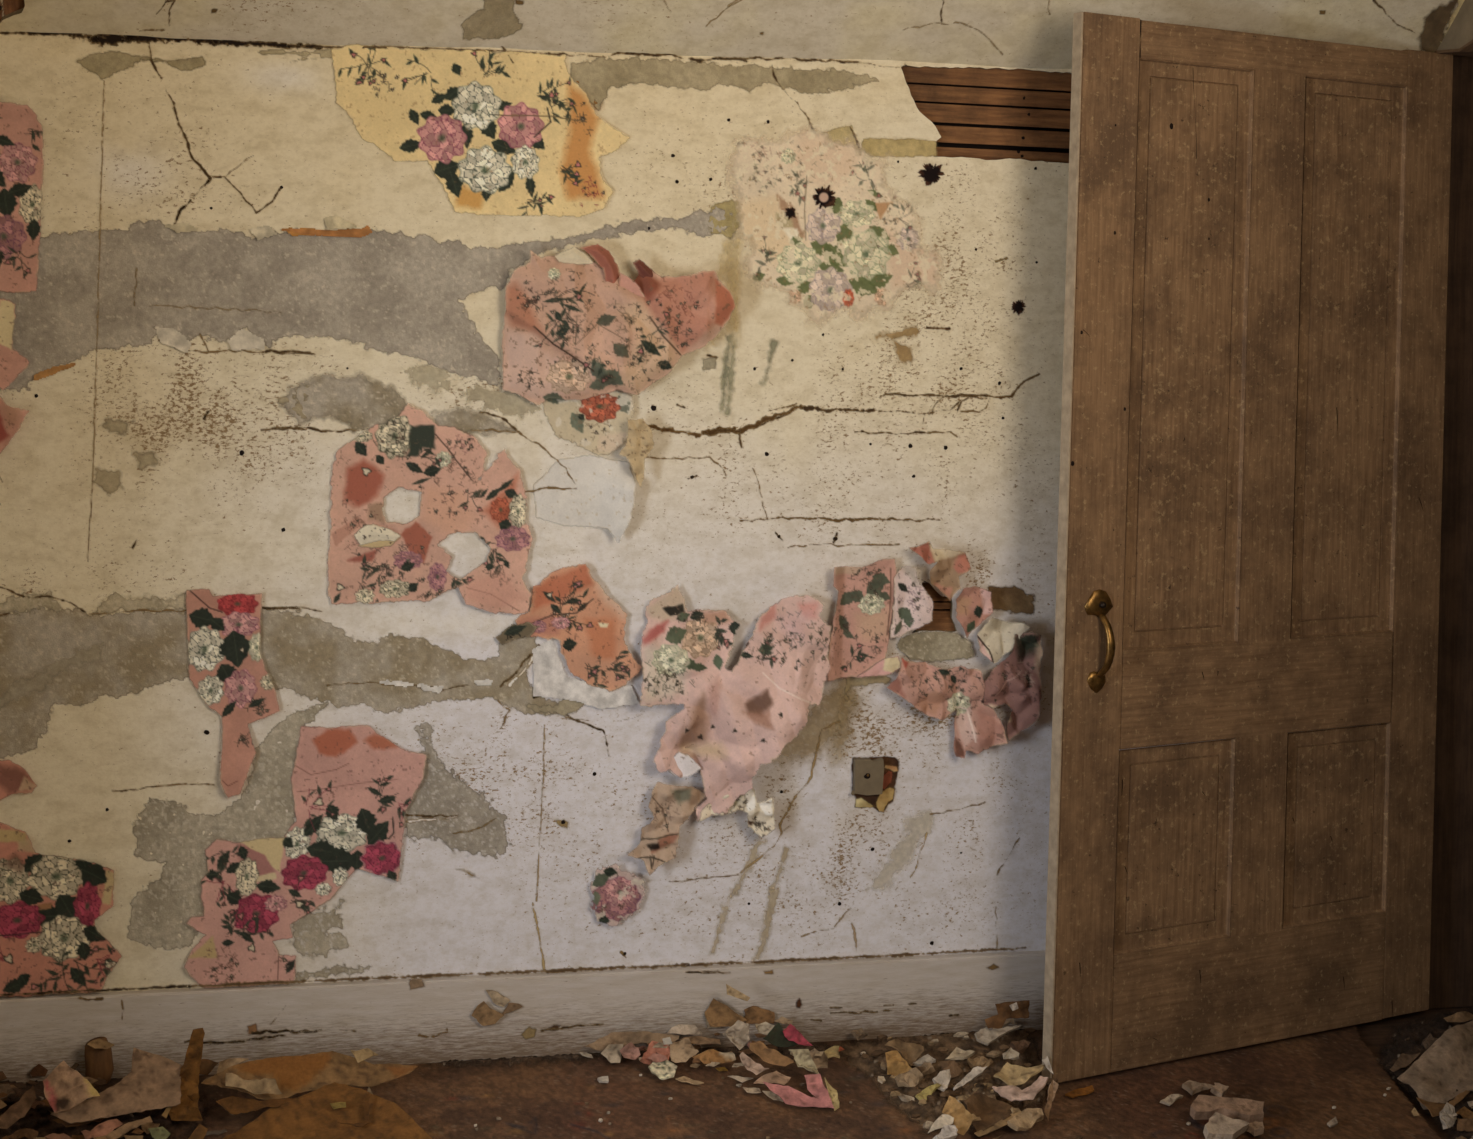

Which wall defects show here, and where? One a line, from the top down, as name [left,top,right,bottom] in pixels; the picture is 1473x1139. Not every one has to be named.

spalling [0,0,25,23]
flaking render [461,0,524,40]
crack [1373,0,1413,32]
crack [144,0,282,224]
spalling [822,65,1072,186]
crack [88,84,314,551]
flaking render [0,199,741,392]
crack [646,373,1040,547]
flaking render [0,591,190,759]
flaking render [127,608,639,950]
flaking render [293,899,370,981]